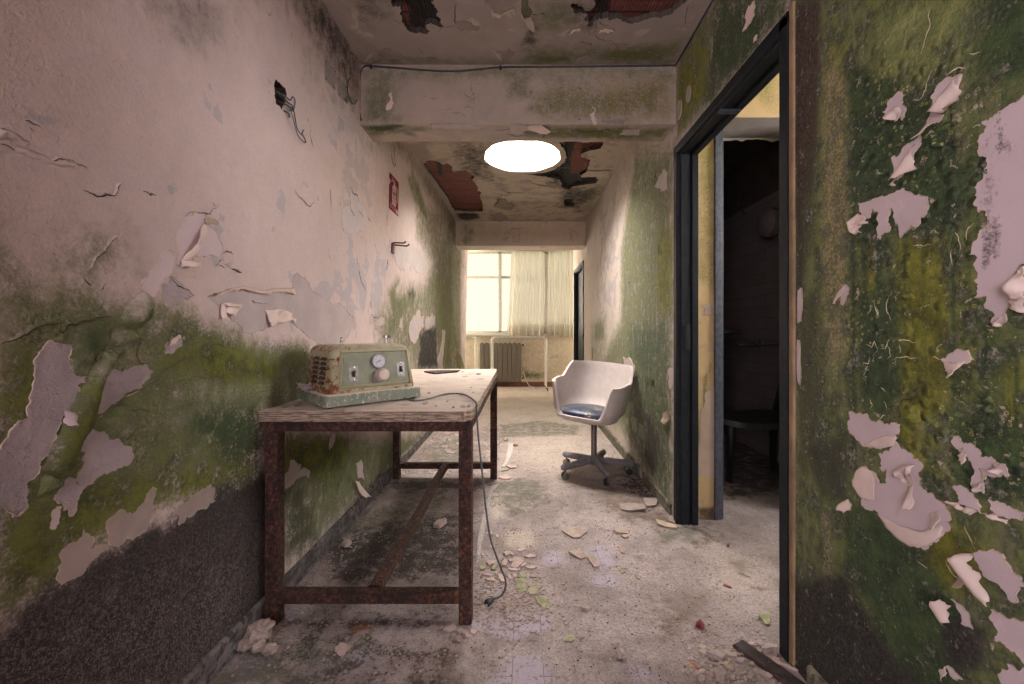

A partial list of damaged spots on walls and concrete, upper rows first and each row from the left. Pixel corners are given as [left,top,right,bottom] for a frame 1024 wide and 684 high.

crack [0,119,156,197]
damp [795,0,859,372]
peeling [846,73,963,240]
peeling [969,95,1024,327]
peeling [0,340,87,518]
peeling [49,364,153,530]
damp [313,534,400,587]
damp [285,464,459,574]
damp [795,563,901,684]
peeling [836,411,1024,550]
damp [926,599,1005,684]
peeling [929,549,1024,684]